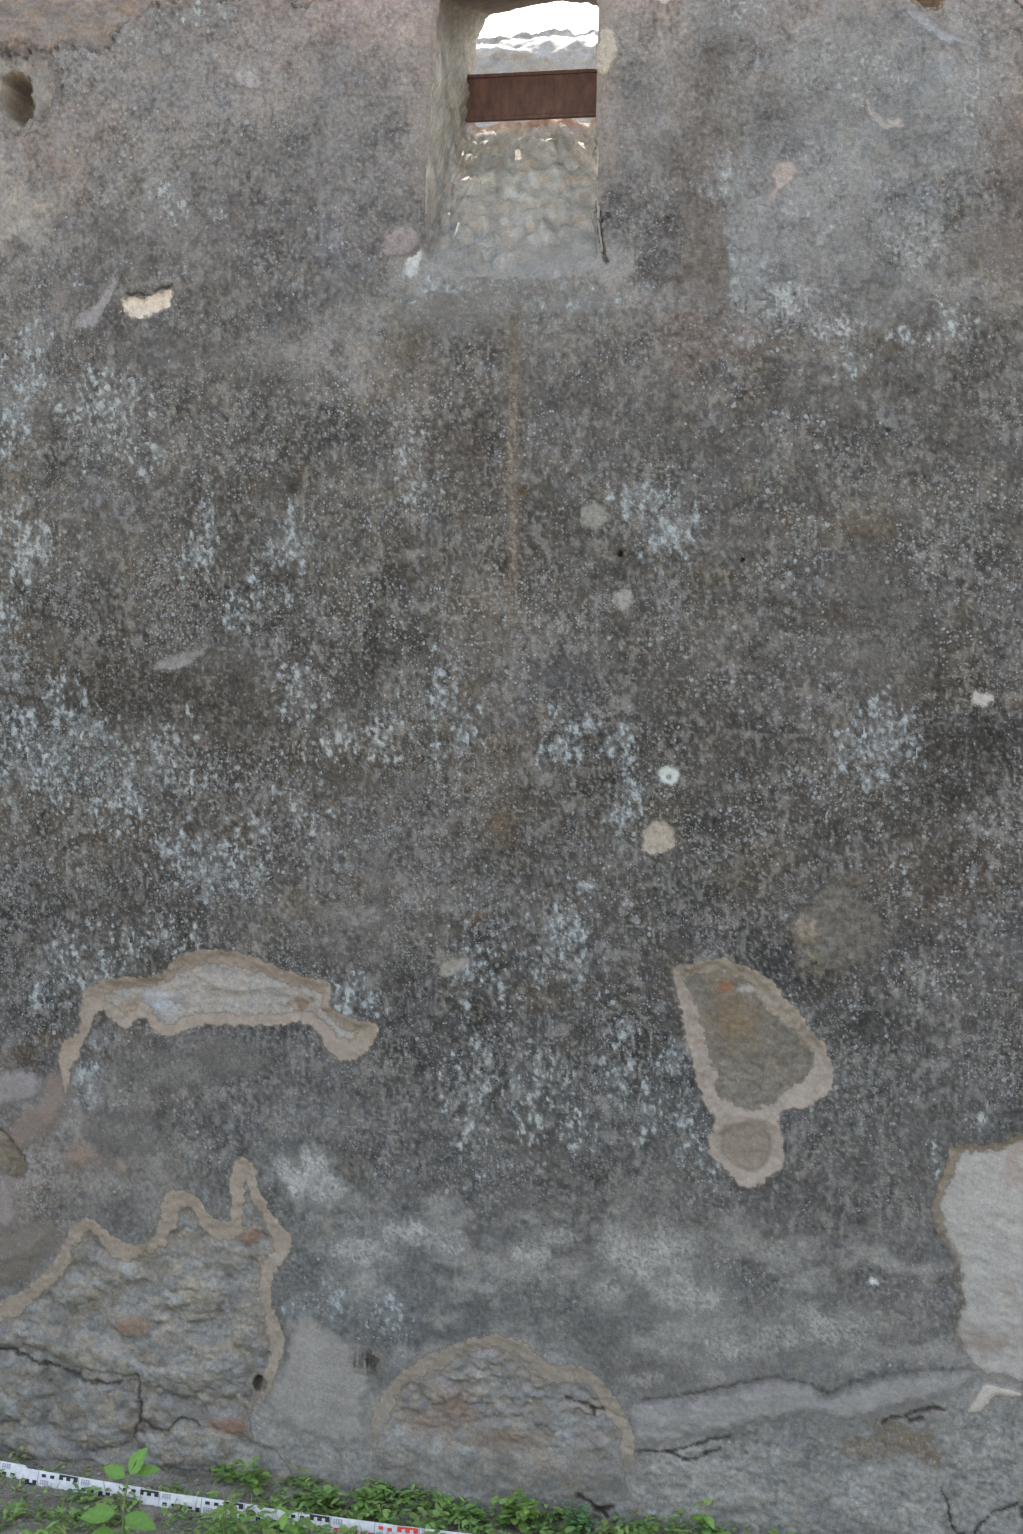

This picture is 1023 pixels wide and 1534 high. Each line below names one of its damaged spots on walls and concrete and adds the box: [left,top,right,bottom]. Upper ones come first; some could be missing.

flaking render [0,0,178,138]
flaking render [233,68,262,89]
flaking render [50,269,172,328]
flaking render [58,948,379,1094]
flaking render [673,957,834,1189]
flaking render [0,1129,27,1179]
flaking render [0,1157,294,1482]
flaking render [931,1133,1023,1413]
flaking render [370,1333,637,1498]
crack [637,1436,729,1461]
crack [567,1368,954,1423]
crack [943,1494,1023,1534]